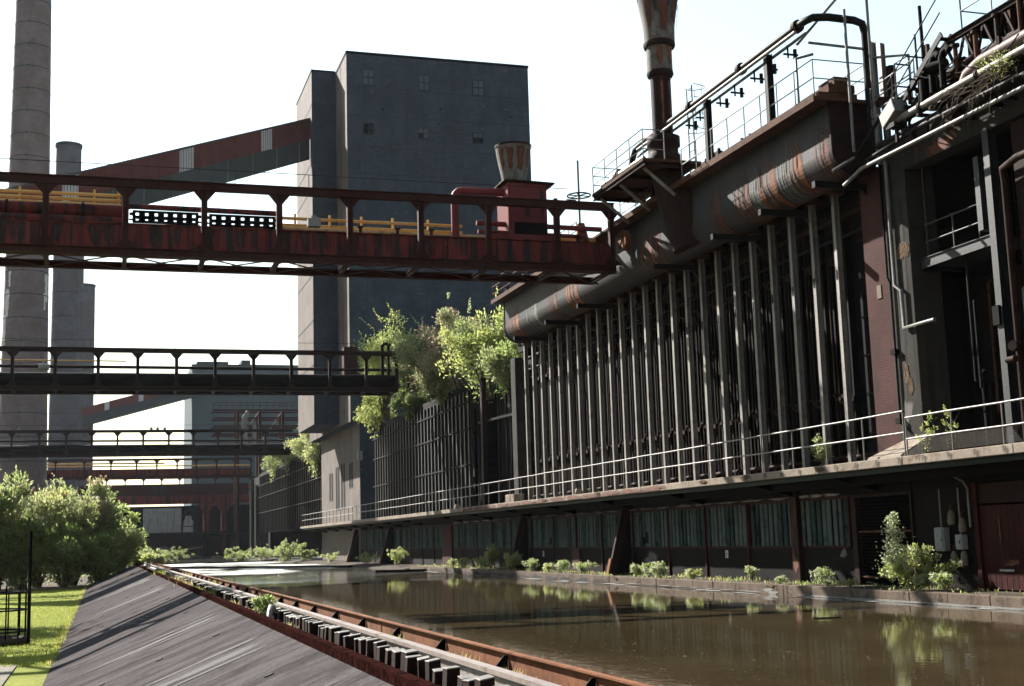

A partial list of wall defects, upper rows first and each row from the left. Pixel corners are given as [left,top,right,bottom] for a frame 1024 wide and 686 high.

rust [644,0,678,29]
rust [657,45,671,64]
rust [660,78,671,125]
rust [498,146,530,170]
rust [733,128,858,225]
spalling [896,241,909,260]
rust [548,284,590,321]
spalling [904,364,914,395]